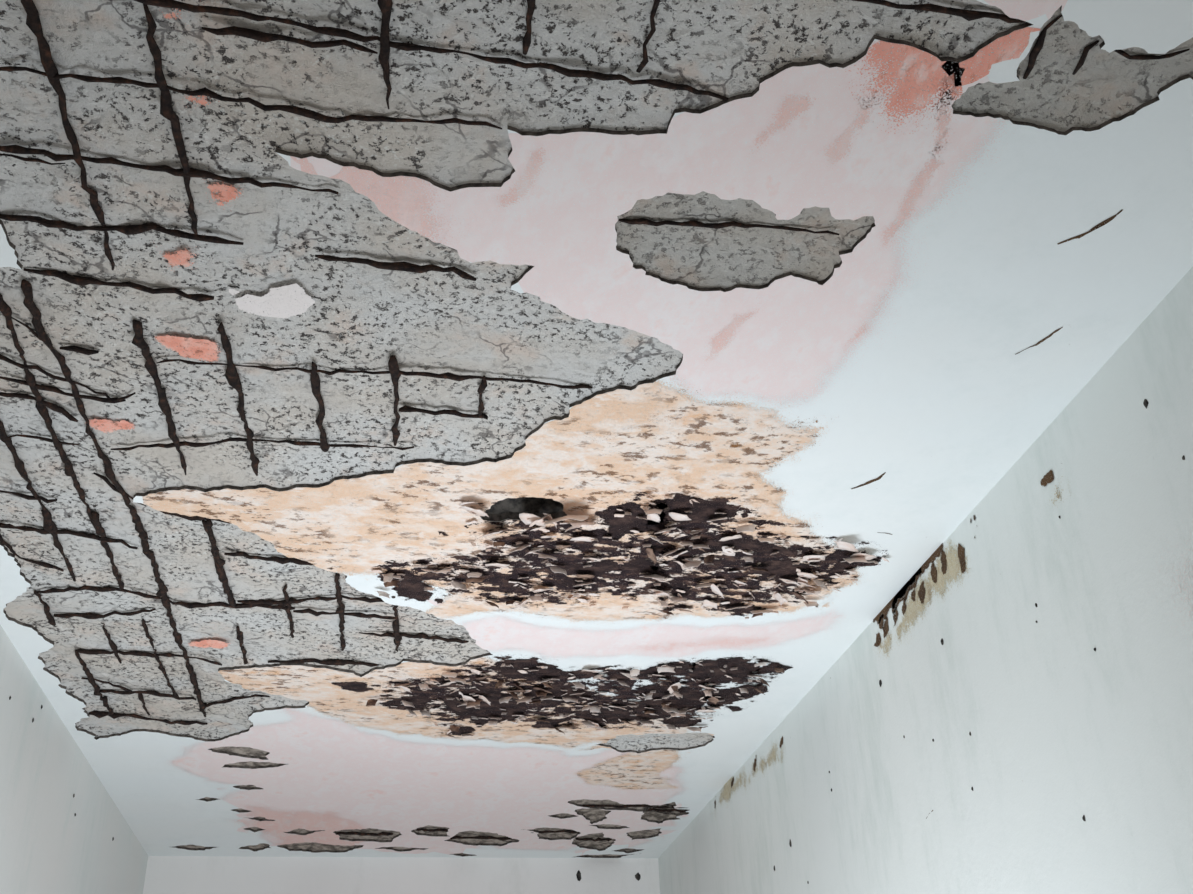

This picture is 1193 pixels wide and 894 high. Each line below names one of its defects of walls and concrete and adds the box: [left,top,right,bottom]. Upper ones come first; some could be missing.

peeling [290,6,1193,418]
spalling [0,0,1033,741]
damp [143,380,889,625]
spalling [208,746,286,769]
damp [219,654,793,790]
spalling [596,732,715,753]
spalling [232,808,519,857]
spalling [529,799,689,881]